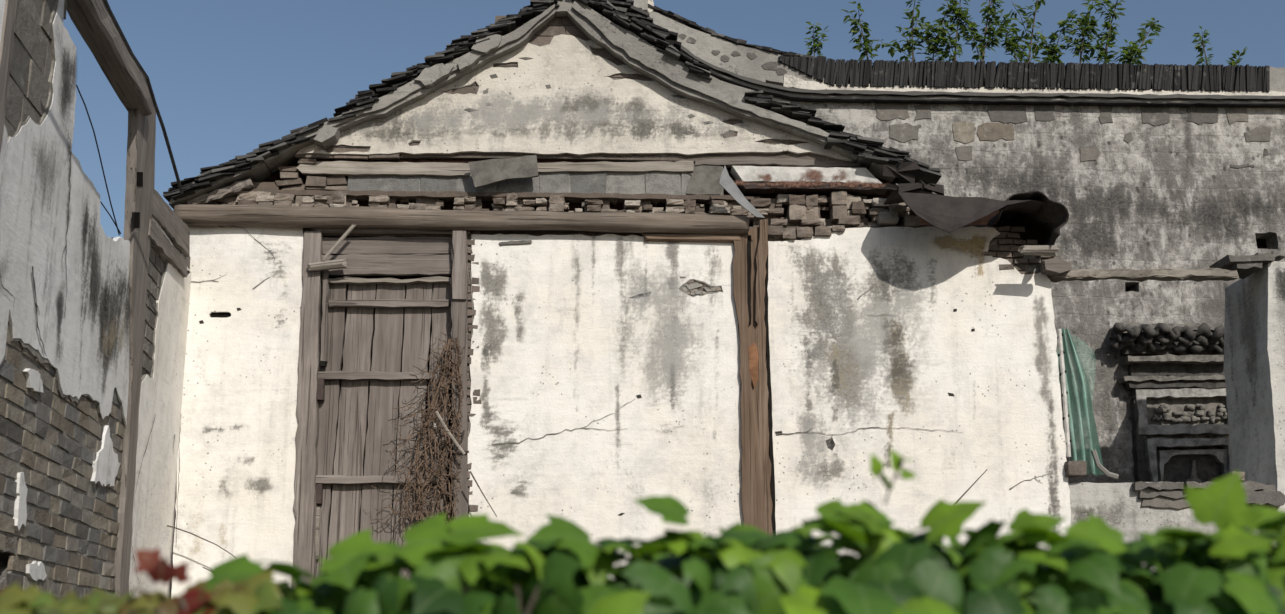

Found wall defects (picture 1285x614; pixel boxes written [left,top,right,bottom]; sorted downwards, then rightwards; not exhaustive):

spalling [4,0,67,142]
damp [62,48,76,113]
damp [346,95,700,139]
damp [955,166,1278,255]
spalling [0,311,126,602]
damp [68,199,130,389]
damp [480,262,523,427]
crack [493,400,633,445]
damp [617,239,694,406]
peeling [679,276,723,297]
damp [794,236,985,481]